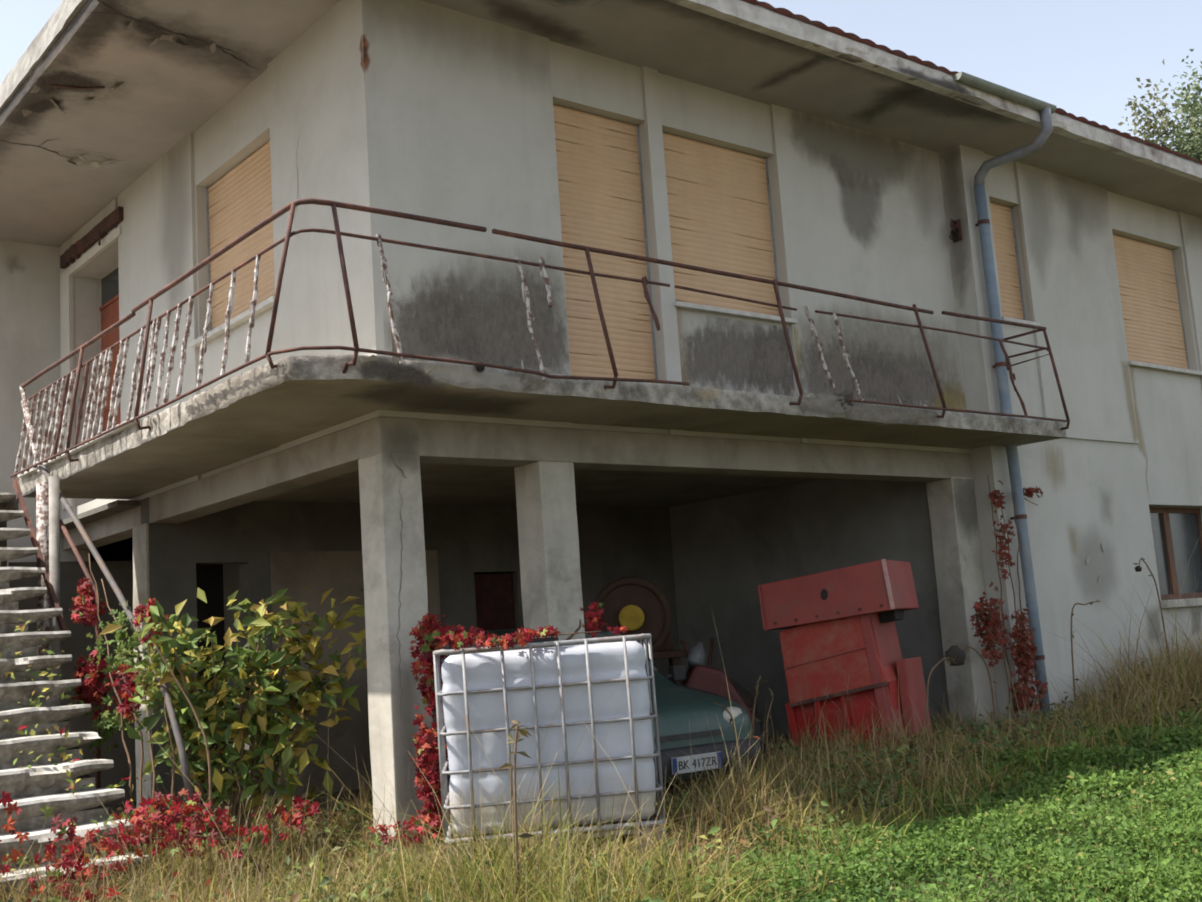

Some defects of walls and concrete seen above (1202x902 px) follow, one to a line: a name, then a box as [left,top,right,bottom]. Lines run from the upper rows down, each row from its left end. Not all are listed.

crack [86,0,259,71]
spalling [22,69,125,117]
crack [0,138,86,159]
water stain [796,117,904,237]
water stain [392,272,567,373]
water stain [683,320,956,412]
crack [395,480,403,717]